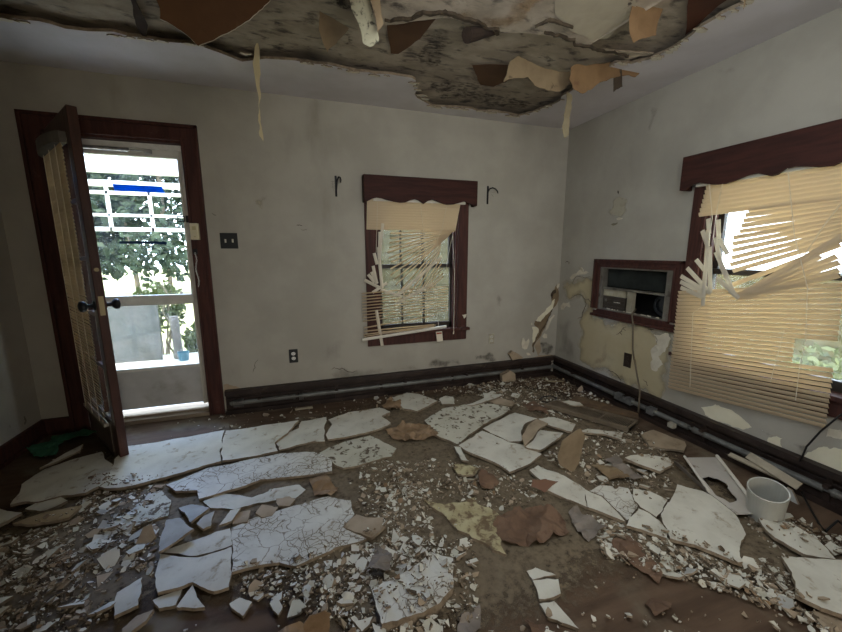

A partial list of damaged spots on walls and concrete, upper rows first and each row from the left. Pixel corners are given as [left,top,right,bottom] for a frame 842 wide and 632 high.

spalling [521,283,570,358]
peeling [651,333,671,371]
peeling [804,428,842,472]